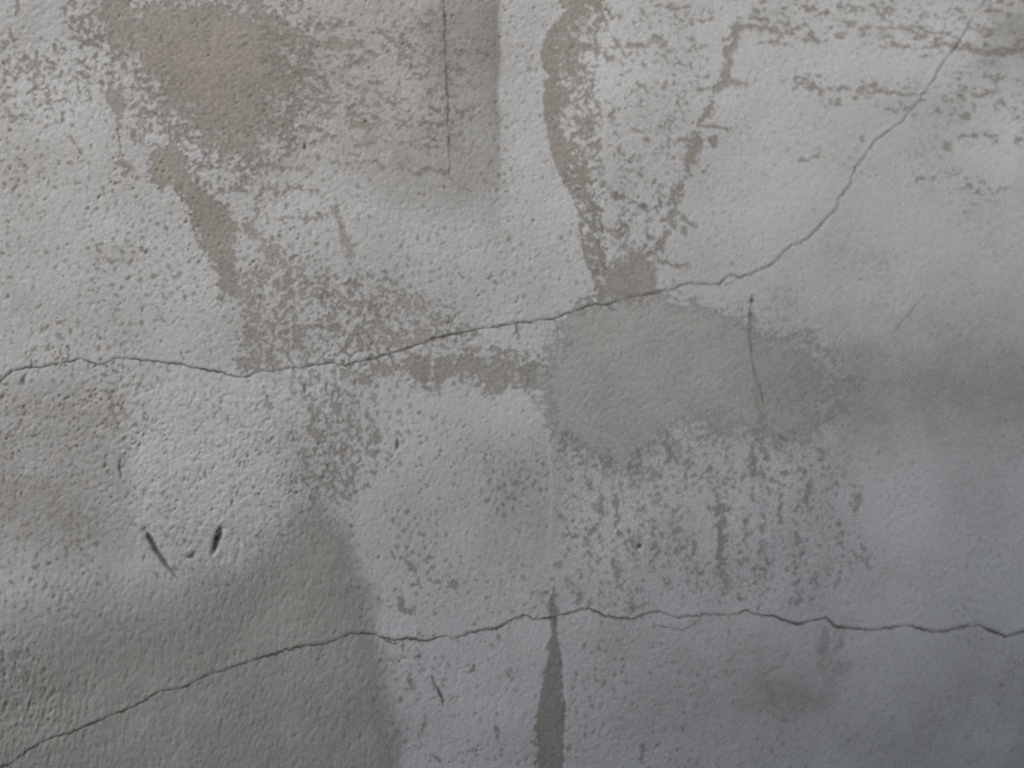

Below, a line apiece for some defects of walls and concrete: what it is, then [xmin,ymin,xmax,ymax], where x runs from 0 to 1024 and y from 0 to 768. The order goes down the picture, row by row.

crack [0,24,969,381]
peeling [0,0,1024,612]
peeling [397,596,415,615]
crack [0,607,1024,767]
peeling [532,577,567,768]